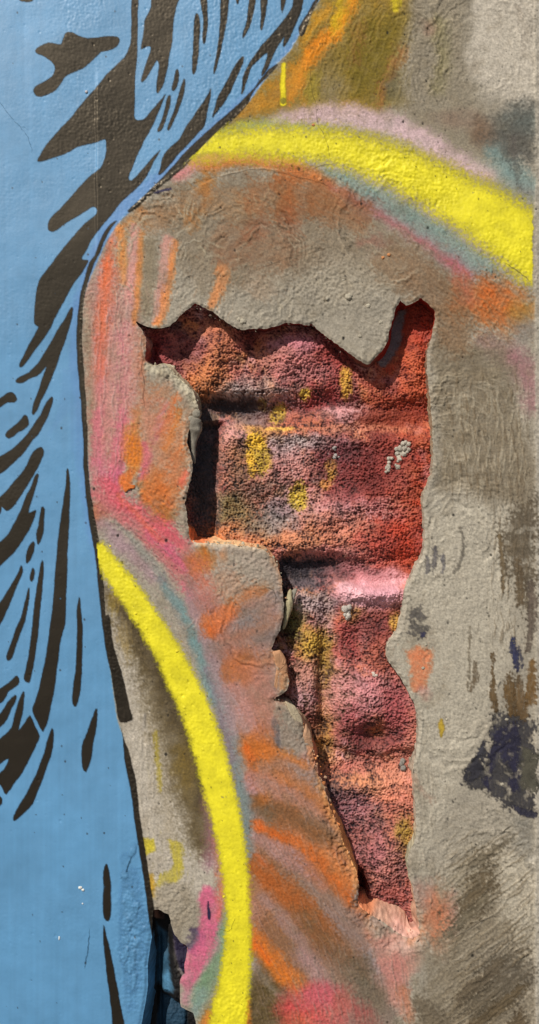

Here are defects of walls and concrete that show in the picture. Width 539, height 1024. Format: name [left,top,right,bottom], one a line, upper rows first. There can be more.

spalling [136,298,464,939]
spalling [141,909,196,1024]